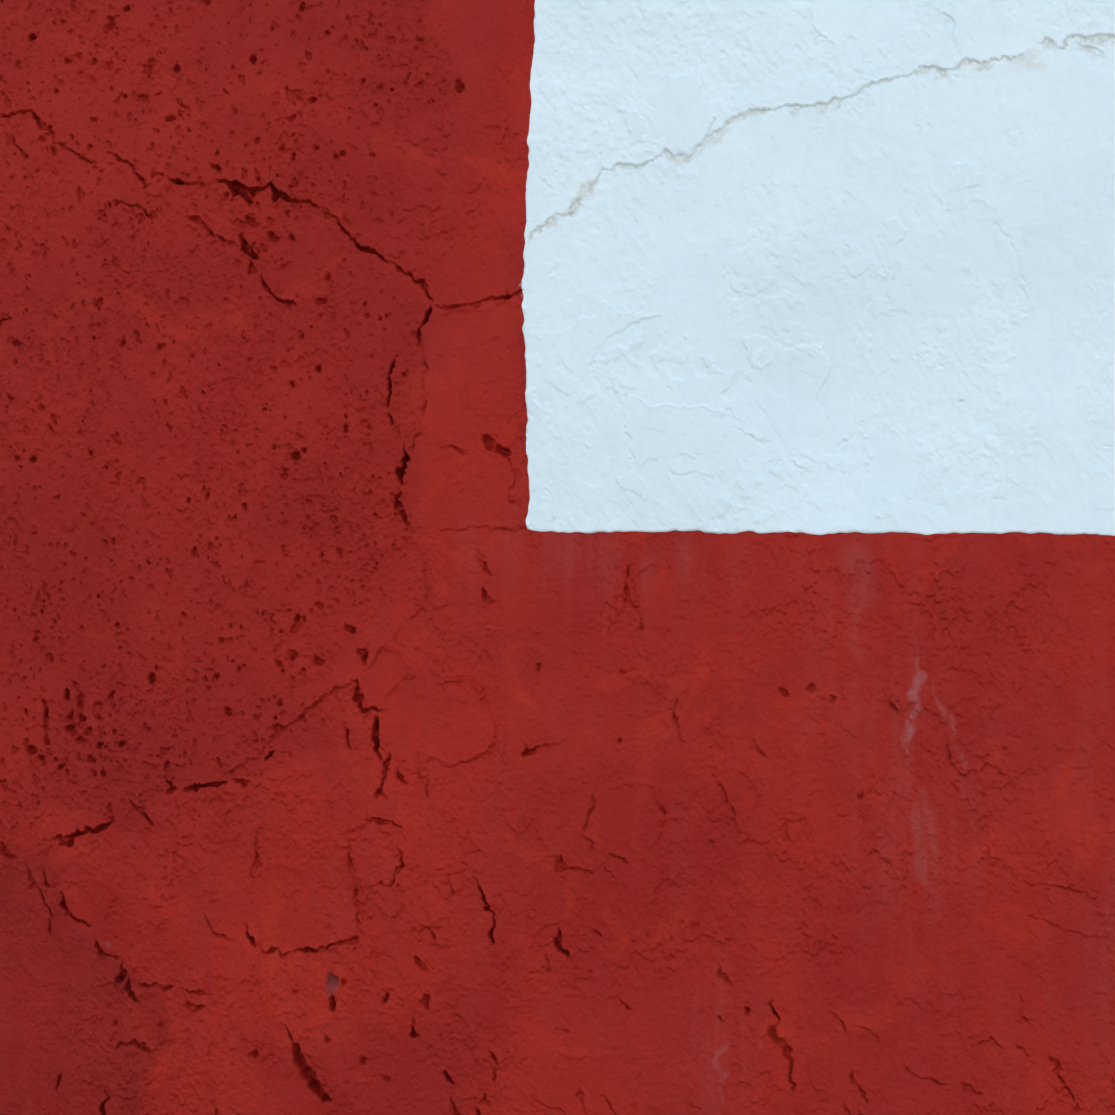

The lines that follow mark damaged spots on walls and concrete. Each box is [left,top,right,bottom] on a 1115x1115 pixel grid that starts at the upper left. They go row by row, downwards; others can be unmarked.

crack [524,0,1115,242]
crack [0,102,532,542]
crack [202,645,489,961]
crack [520,736,567,758]
crack [0,729,284,1058]
crack [446,870,505,954]
crack [409,917,450,1042]
crack [443,1044,508,1115]
crack [711,960,739,1033]
crack [766,991,879,1115]
crack [902,1059,1021,1115]
crack [969,1031,1092,1114]